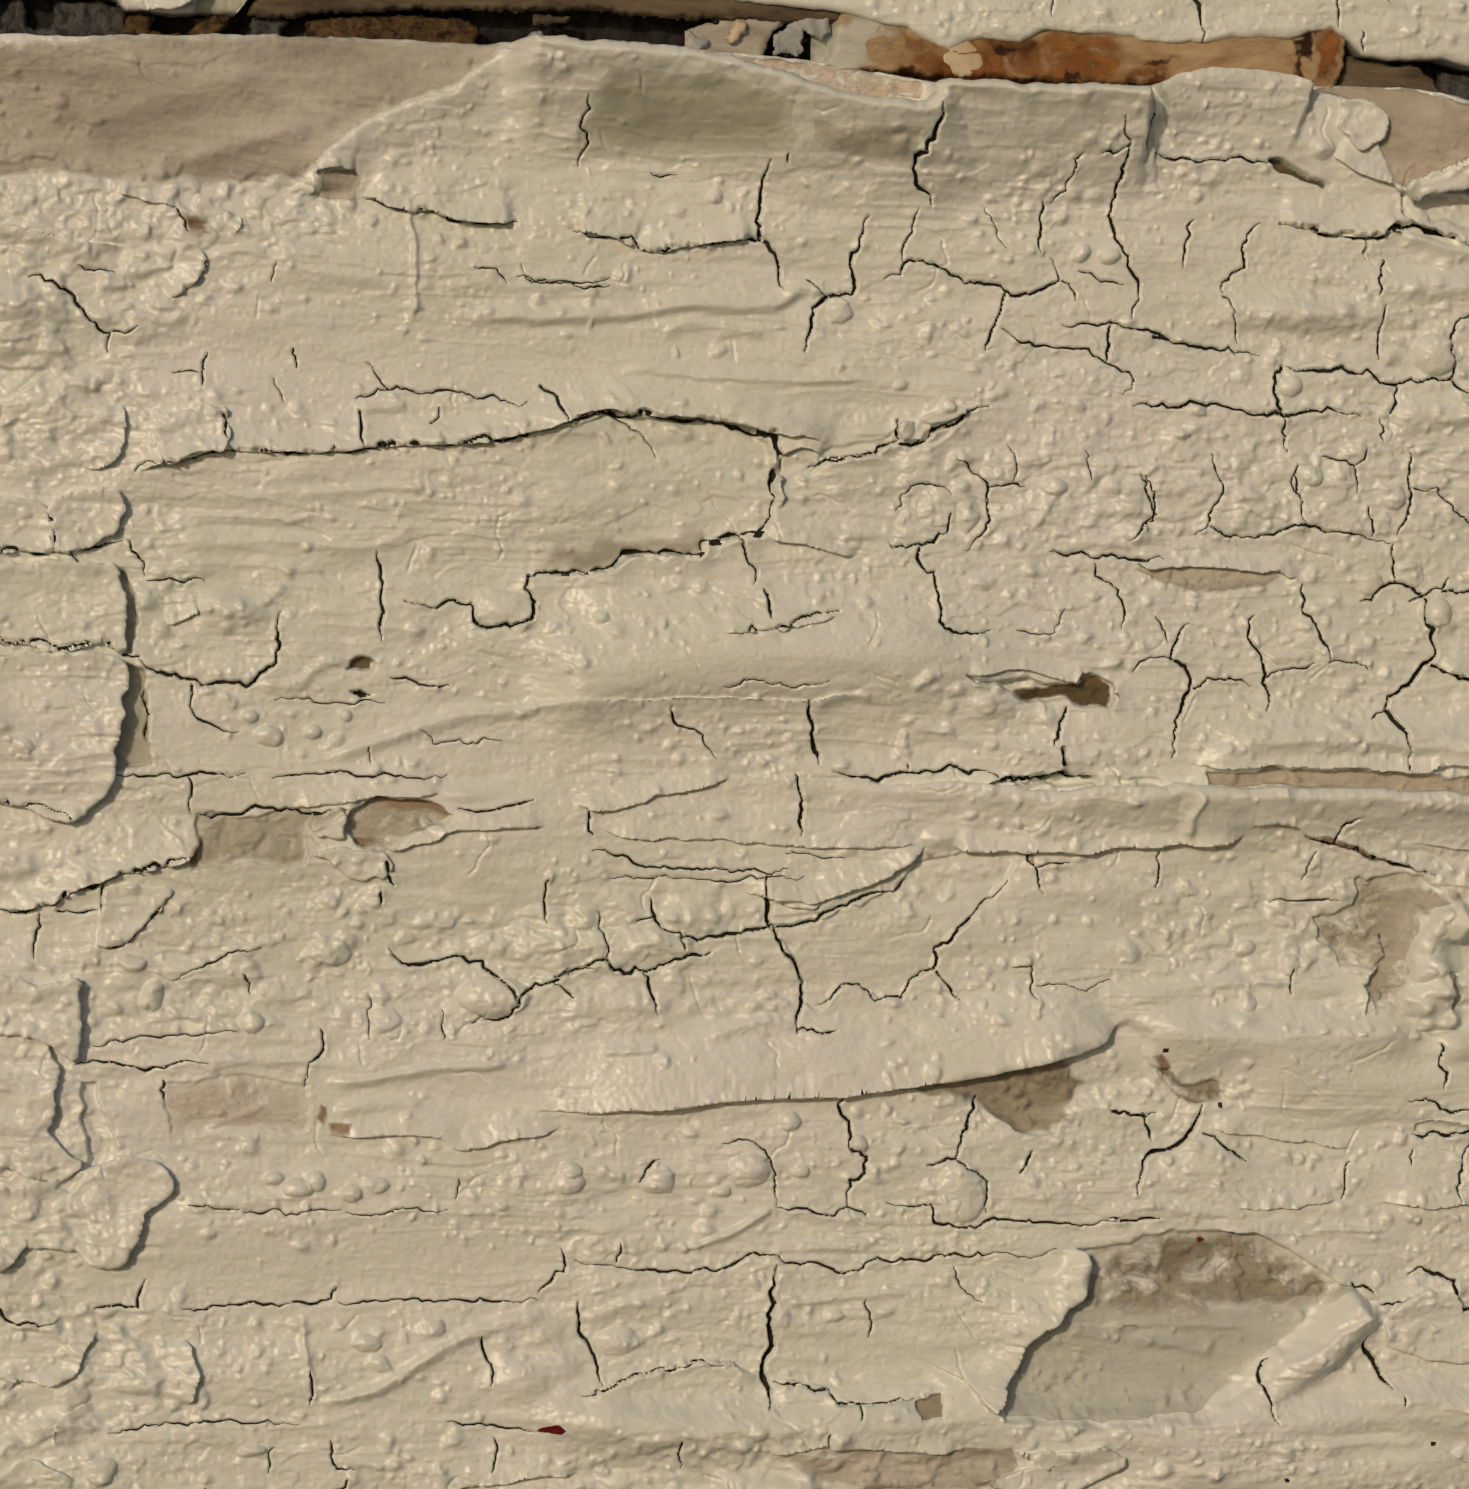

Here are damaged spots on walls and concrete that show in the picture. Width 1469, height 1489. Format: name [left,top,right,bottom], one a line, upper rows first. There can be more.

peeling [142,0,191,11]
peeling [0,17,1469,272]
crack [135,348,1065,642]
crack [573,94,1469,770]
crack [1,857,190,959]
crack [0,615,534,820]
peeling [347,796,539,851]
crack [389,679,1089,1040]
peeling [750,750,1469,1027]
peeling [335,1002,1116,1151]
crack [182,1095,1247,1448]
peeling [948,1234,1469,1423]